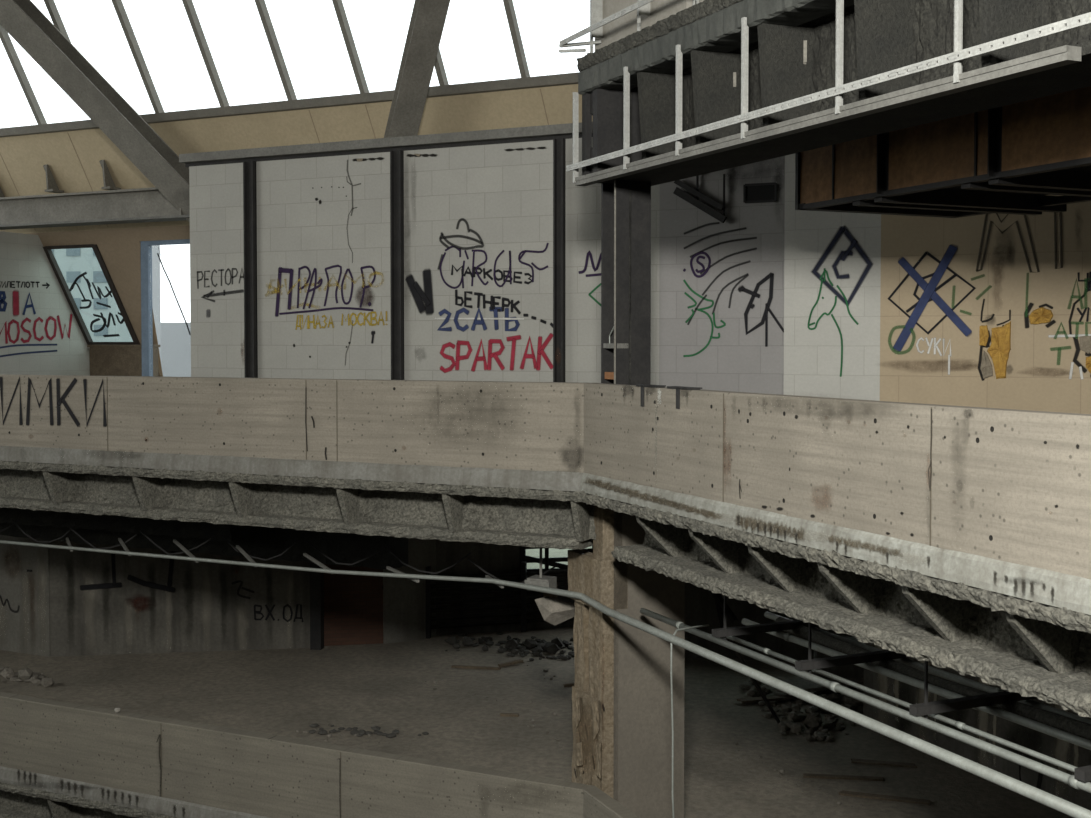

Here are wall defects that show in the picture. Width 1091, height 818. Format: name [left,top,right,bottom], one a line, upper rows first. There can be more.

crack [346,160,361,263]
peeling [585,478,721,519]
peeling [736,506,804,542]
peeling [829,532,900,561]